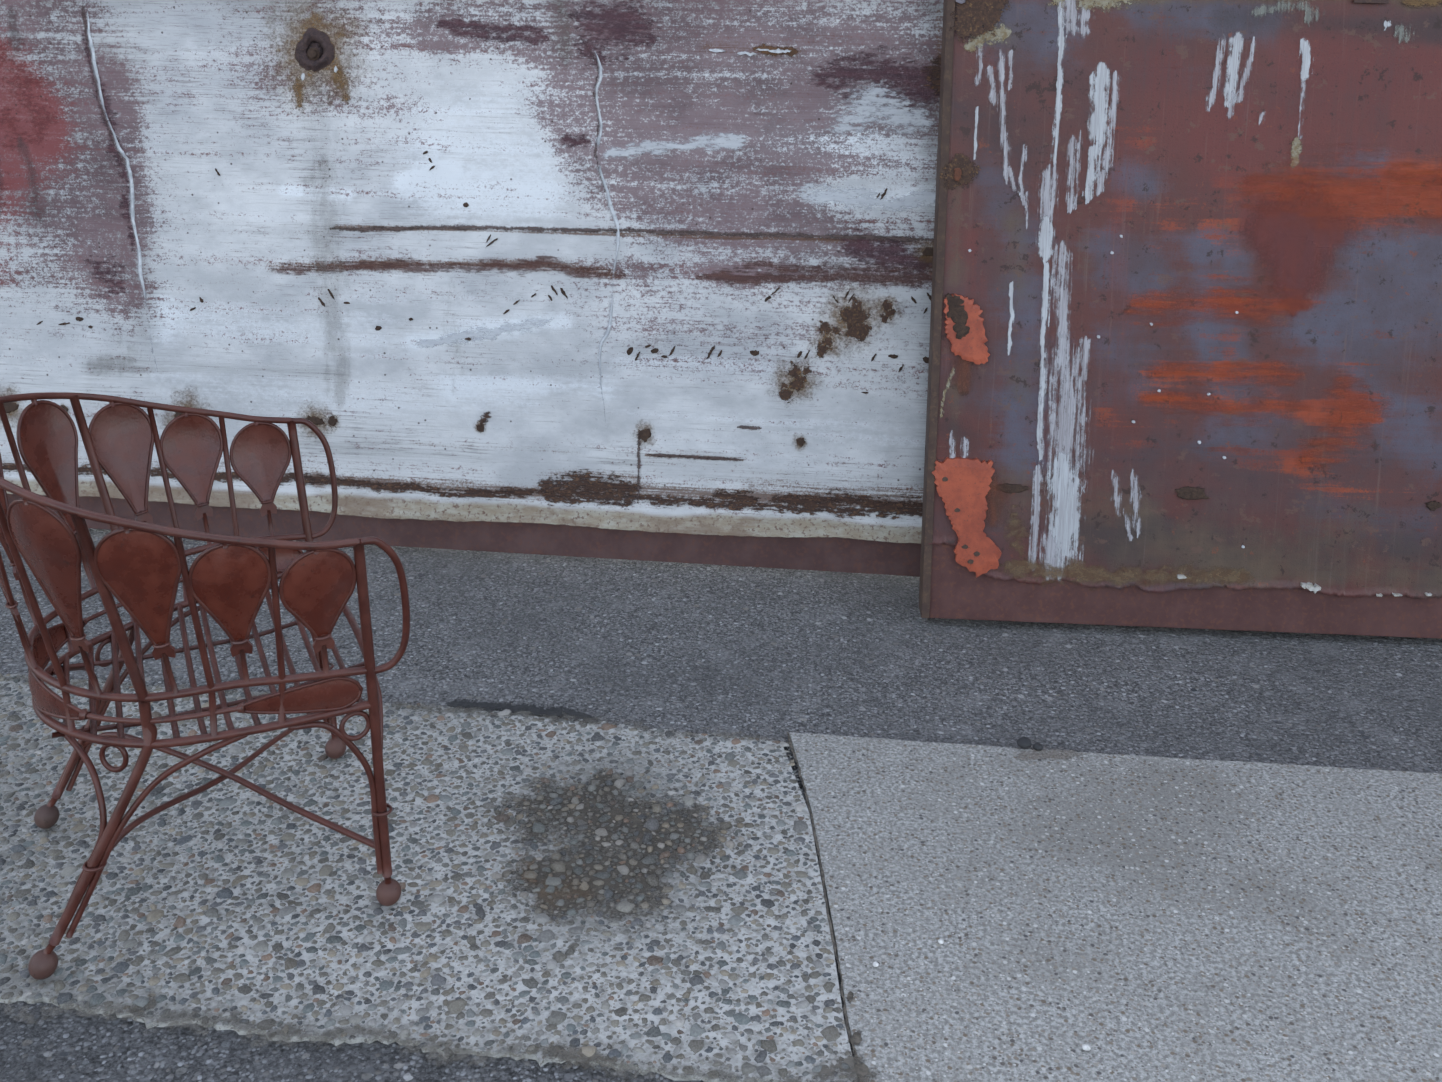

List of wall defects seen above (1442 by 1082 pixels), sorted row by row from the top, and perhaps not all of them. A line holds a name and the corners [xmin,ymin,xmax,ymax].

rust [270,1,359,107]
peeling [1048,0,1133,36]
peeling [837,229,933,276]
rust [696,243,933,403]
peeling [911,293,990,393]
peeling [932,457,1030,578]
damp [502,770,732,928]